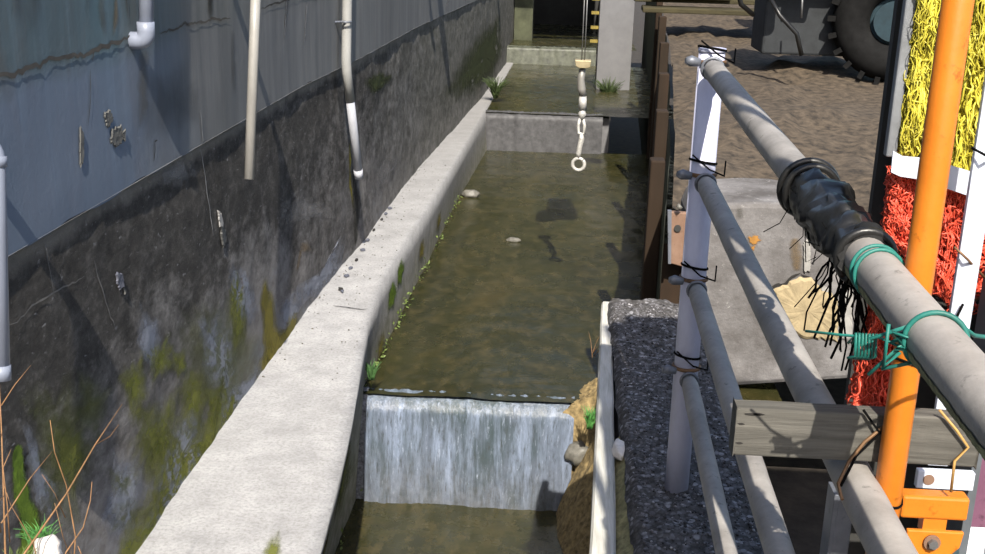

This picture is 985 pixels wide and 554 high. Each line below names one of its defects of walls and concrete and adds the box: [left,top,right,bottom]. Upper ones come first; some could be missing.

crack [161,17,230,34]
crack [0,0,130,123]
peeling [104,109,126,148]
spalling [115,272,126,295]
water stain [140,319,157,364]
water stain [202,245,338,418]
water stain [28,444,53,499]
water stain [105,464,141,532]
water stain [156,419,201,524]